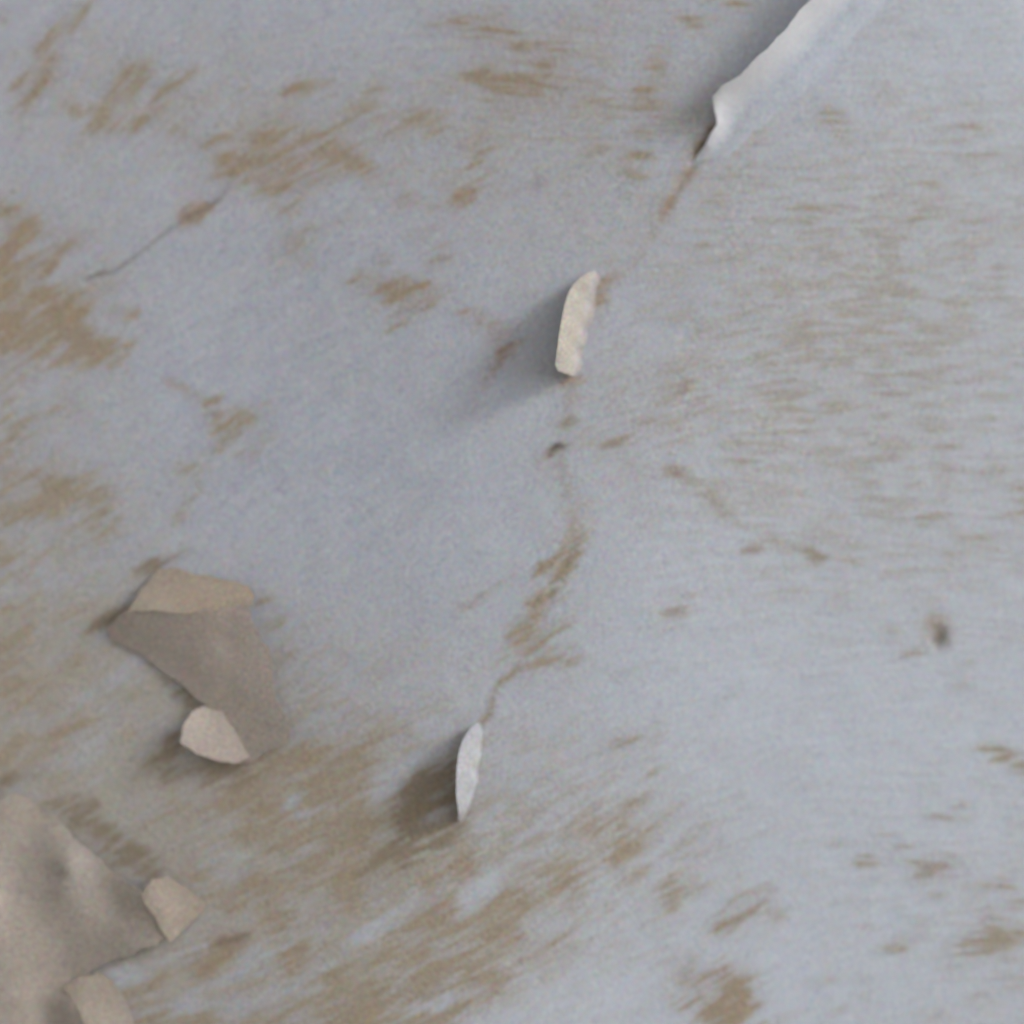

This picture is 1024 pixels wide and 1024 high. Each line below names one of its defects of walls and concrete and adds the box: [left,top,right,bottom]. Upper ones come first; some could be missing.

peeling [669,0,765,36]
peeling [694,0,887,163]
crack [113,190,225,270]
peeling [0,183,700,1024]